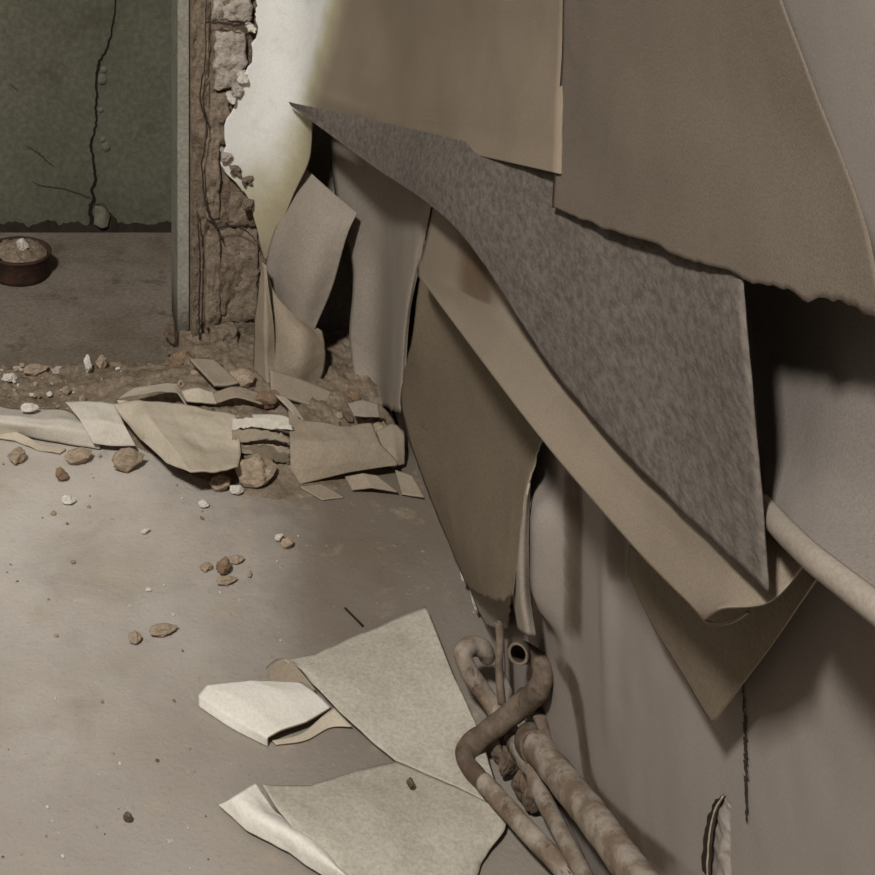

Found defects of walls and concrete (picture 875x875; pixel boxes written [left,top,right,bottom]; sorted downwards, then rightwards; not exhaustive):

crack [26,0,116,226]
spalling [189,0,267,345]
crack [741,684,749,822]